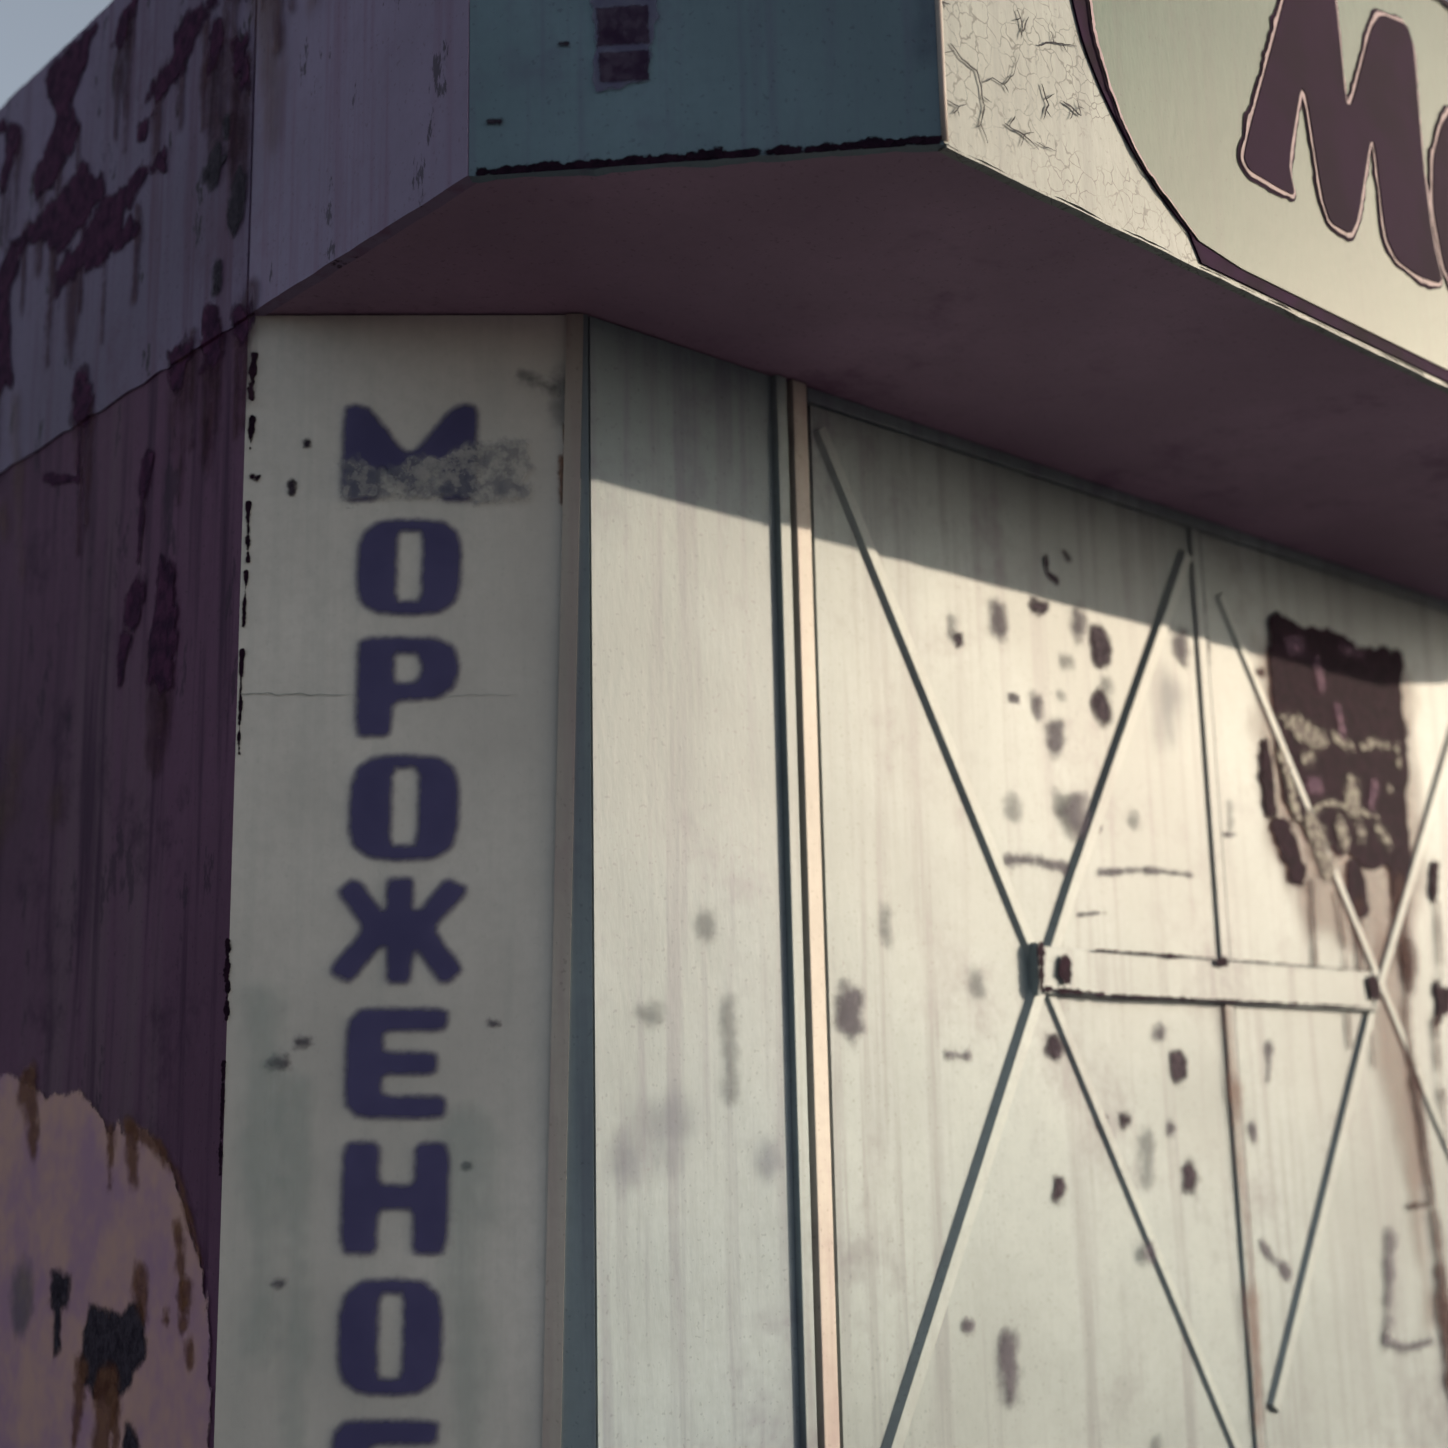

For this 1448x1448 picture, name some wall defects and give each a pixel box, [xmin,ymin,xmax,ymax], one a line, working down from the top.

crack [945,10,1084,151]
rust [476,135,942,176]
rust [0,0,234,554]
rust [166,283,256,465]
peeling [1073,609,1112,669]
peeling [1009,693,1064,753]
peeling [1091,689,1112,725]
rust [1038,611,1448,1385]
peeling [1157,1024,1188,1083]
peeling [1053,1177,1066,1202]
peeling [1183,1161,1197,1194]
peeling [0,1073,211,1448]